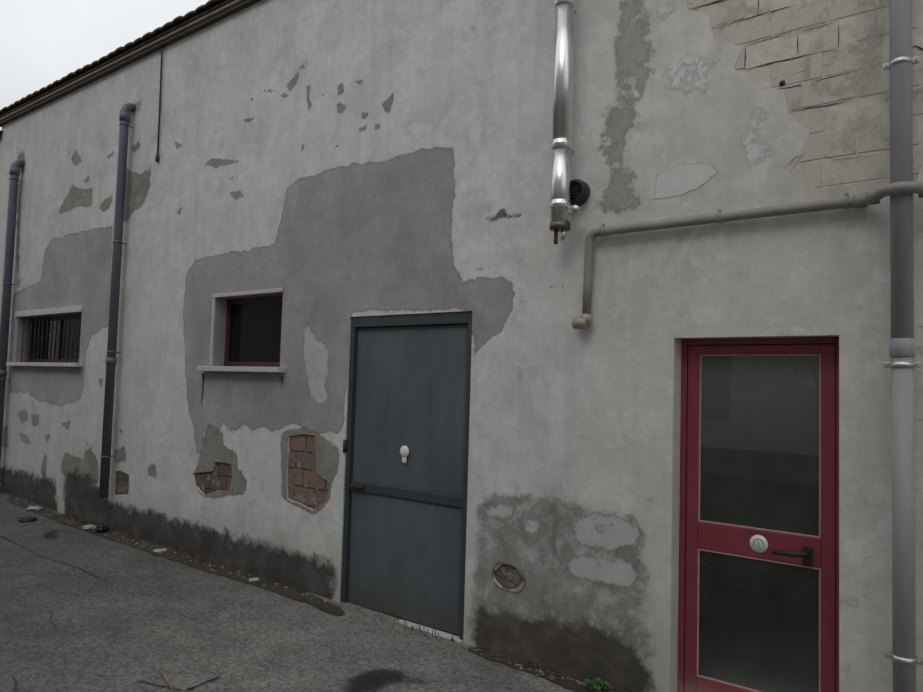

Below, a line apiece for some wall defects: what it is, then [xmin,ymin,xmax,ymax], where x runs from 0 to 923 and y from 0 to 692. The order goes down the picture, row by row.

peeling [264,61,311,109]
flaking render [687,0,890,199]
flaking render [912,0,923,181]
peeling [58,176,113,214]
peeling [124,167,151,222]
peeling [9,226,112,406]
peeling [183,147,515,514]
peeling [61,447,98,484]
flaking render [114,446,129,495]
damp [0,466,336,600]
peeling [468,494,646,656]
damp [473,608,654,692]